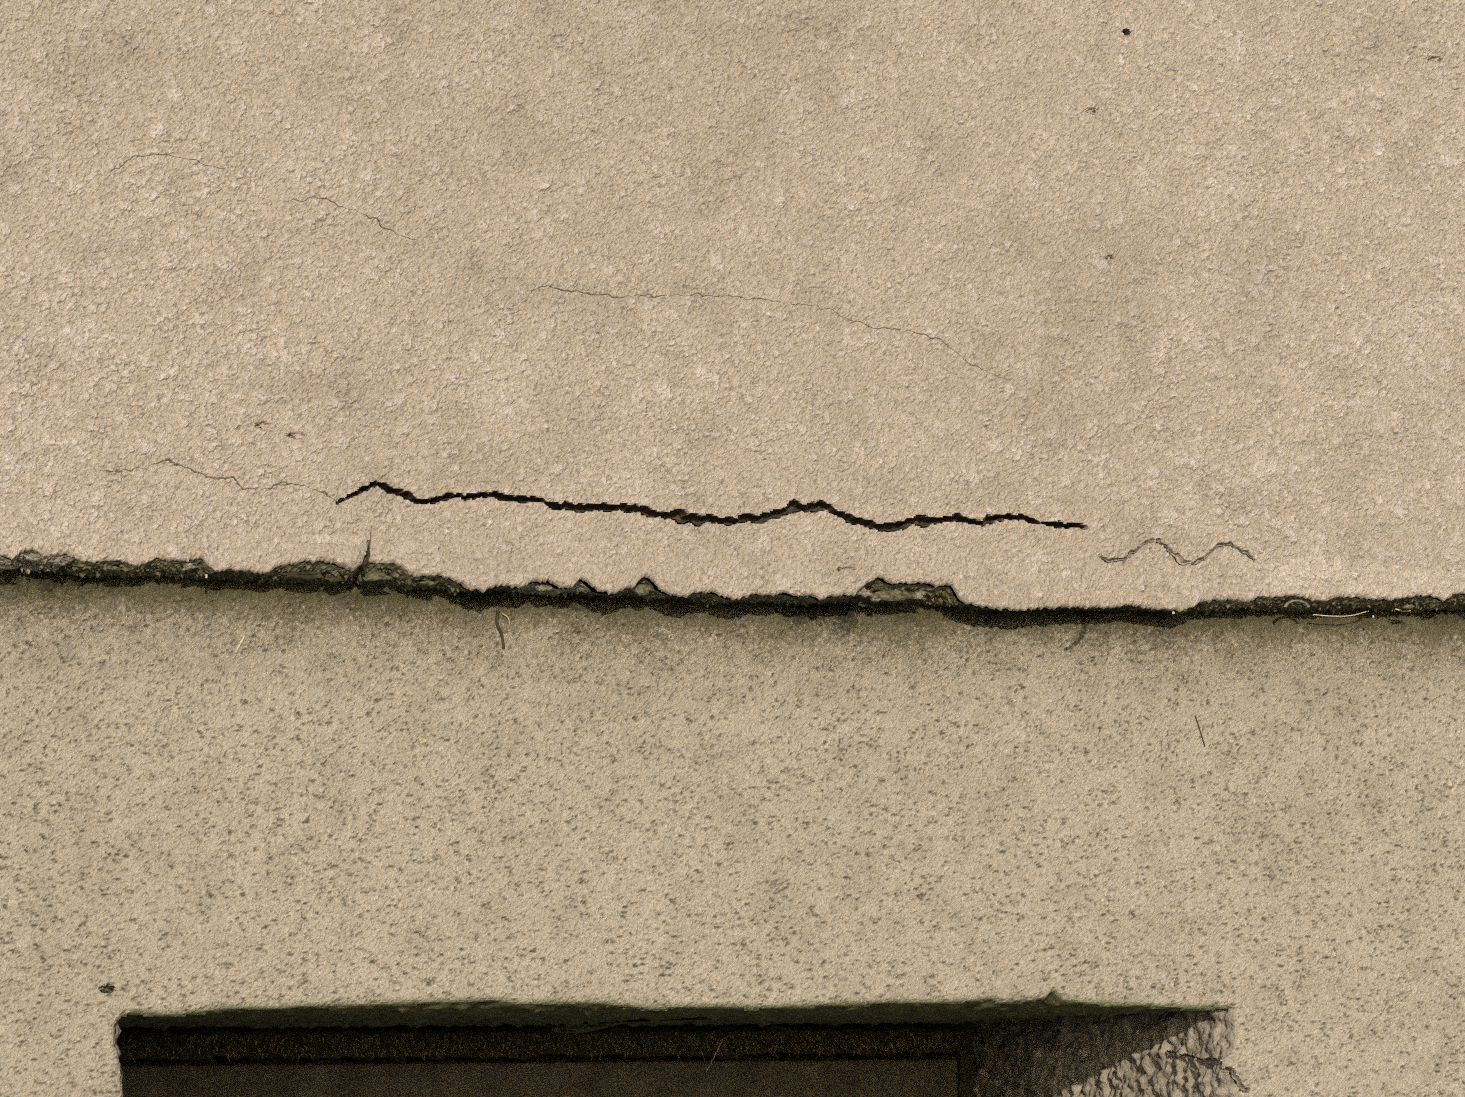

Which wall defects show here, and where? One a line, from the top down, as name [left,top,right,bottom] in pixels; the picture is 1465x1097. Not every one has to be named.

crack [99,458,1254,574]